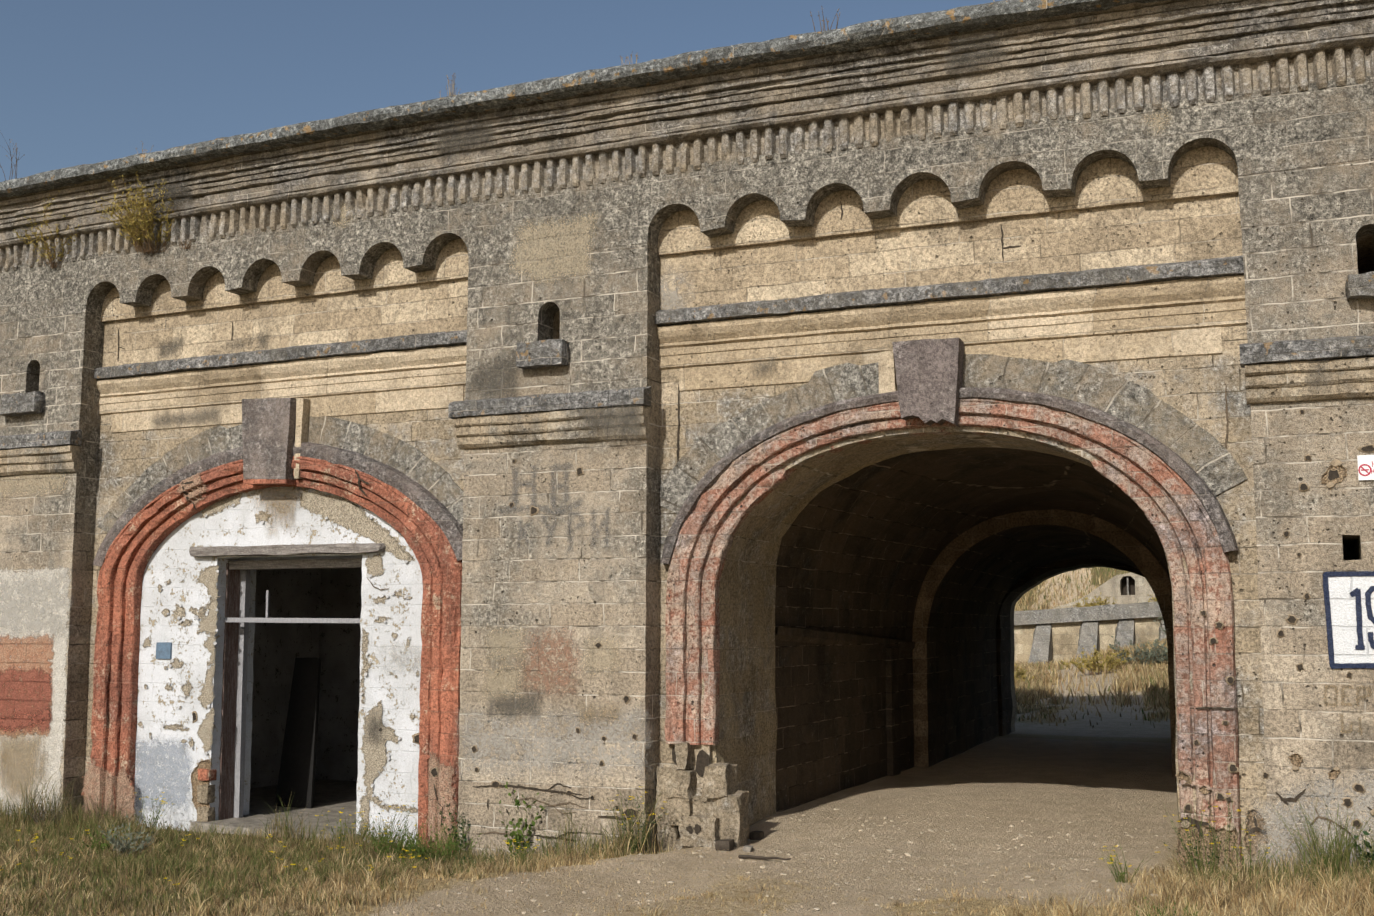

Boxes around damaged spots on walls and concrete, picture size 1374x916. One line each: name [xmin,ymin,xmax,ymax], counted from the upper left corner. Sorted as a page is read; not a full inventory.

hole [1357,444,1374,453]
spalling [177,473,242,518]
flaking render [254,511,272,524]
flaking render [300,487,416,577]
hole [1299,459,1348,492]
spalling [1277,614,1299,638]
flaking render [137,565,220,781]
flaking render [359,589,458,847]
spalling [1288,753,1303,770]
spalling [1328,767,1341,780]
spalling [615,742,750,853]
spalling [1342,783,1374,829]